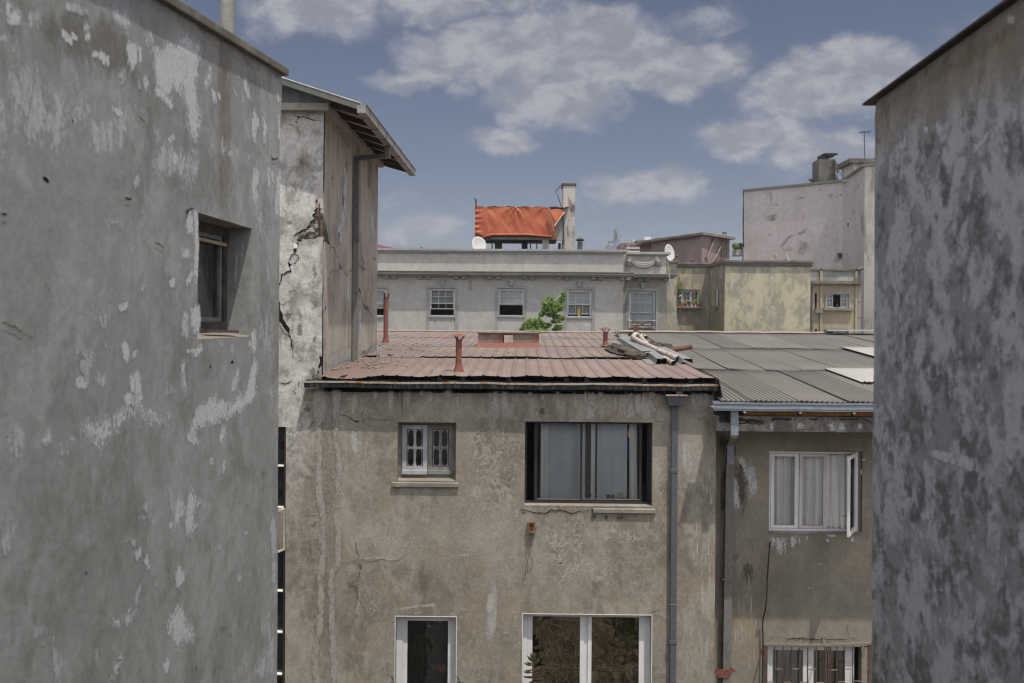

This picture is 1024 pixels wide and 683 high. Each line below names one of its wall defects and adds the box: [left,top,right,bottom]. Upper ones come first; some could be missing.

peeling [92,49,109,67]
peeling [126,26,251,143]
crack [279,243,319,394]
spalling [286,200,353,342]
crack [521,505,617,514]
water stain [681,428,758,513]